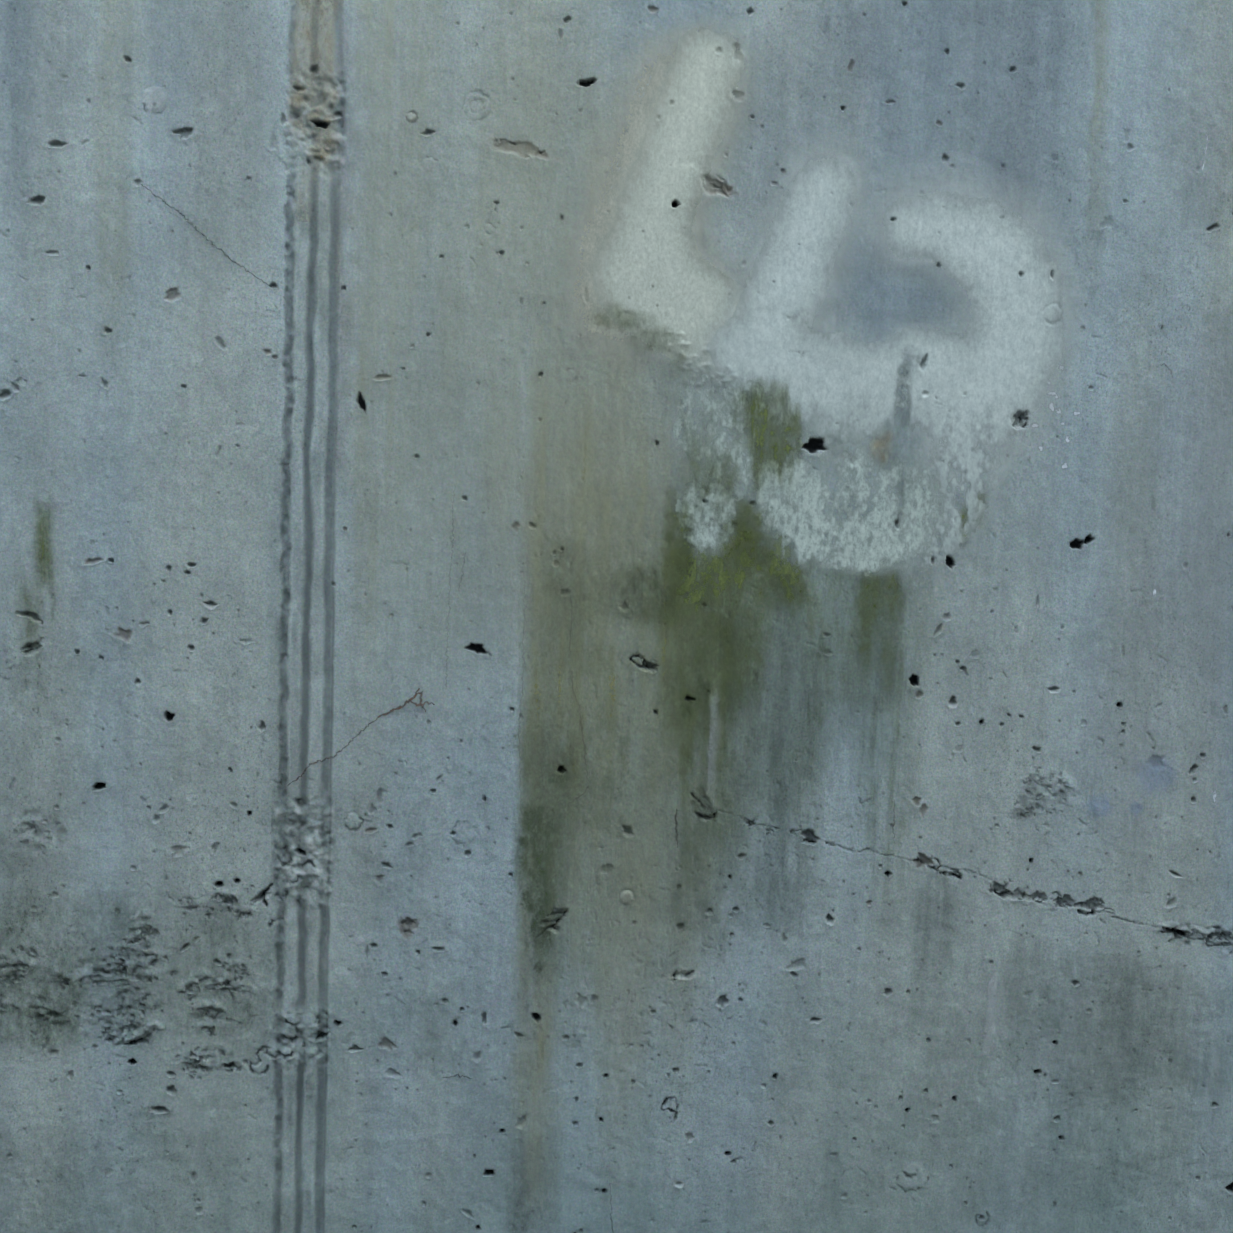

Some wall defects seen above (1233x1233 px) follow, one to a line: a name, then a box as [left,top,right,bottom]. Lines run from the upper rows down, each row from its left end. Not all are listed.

spalling [286,53,343,192]
water stain [767,534,805,604]
crack [675,786,1233,956]
peeling [0,948,40,985]
peeling [0,1004,65,1028]
spalling [52,917,251,1050]
spalling [183,1006,328,1077]